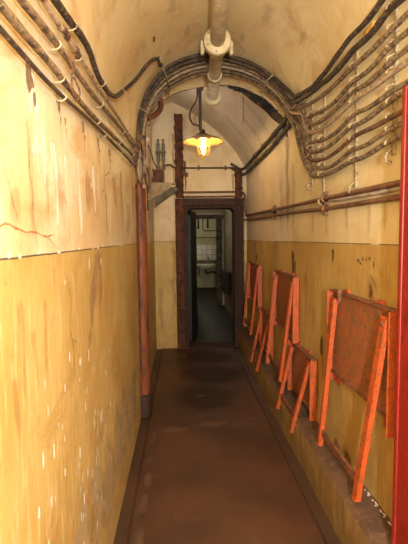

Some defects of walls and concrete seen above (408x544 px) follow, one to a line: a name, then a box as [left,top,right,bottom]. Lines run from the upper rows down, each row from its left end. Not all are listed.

crack [0,182,56,247]
leakage [32,125,99,235]
peeling [75,443,103,522]